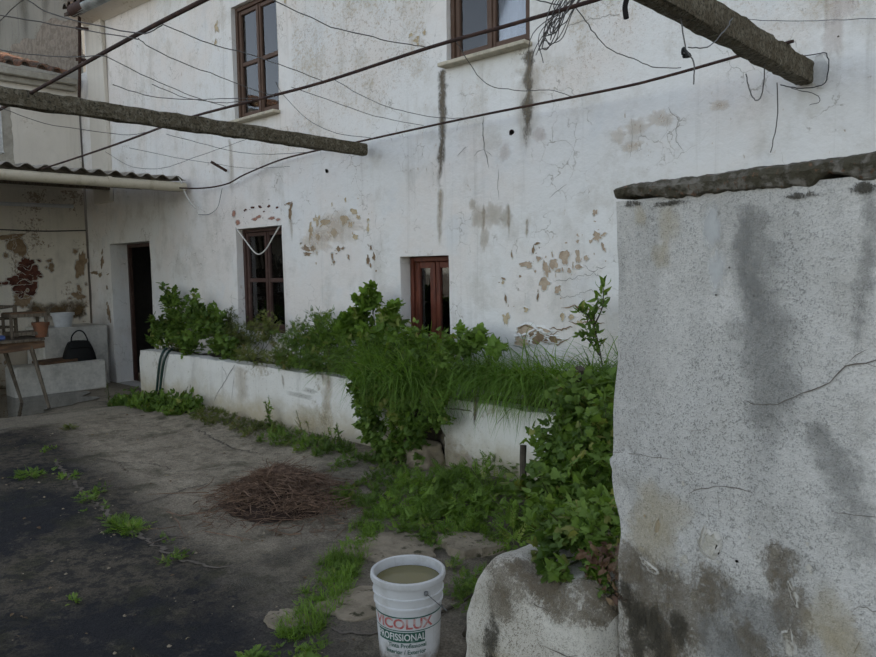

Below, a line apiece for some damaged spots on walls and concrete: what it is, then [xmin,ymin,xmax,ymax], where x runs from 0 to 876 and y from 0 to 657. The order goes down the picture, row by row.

damp [437,70,446,175]
damp [522,51,534,135]
flaking render [0,233,55,309]
peeling [243,200,293,221]
peeling [300,197,370,266]
peeling [366,244,377,272]
peeling [498,209,608,350]
crack [738,350,876,405]
damp [482,542,776,657]
damp [758,542,813,649]